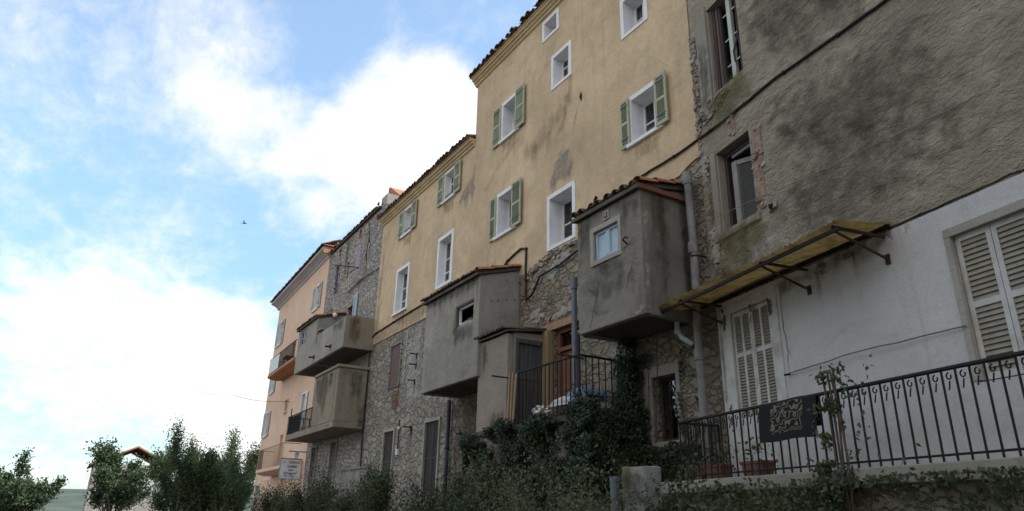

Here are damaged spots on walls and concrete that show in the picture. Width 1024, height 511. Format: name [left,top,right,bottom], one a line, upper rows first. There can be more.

flaking render [749,120,778,213]